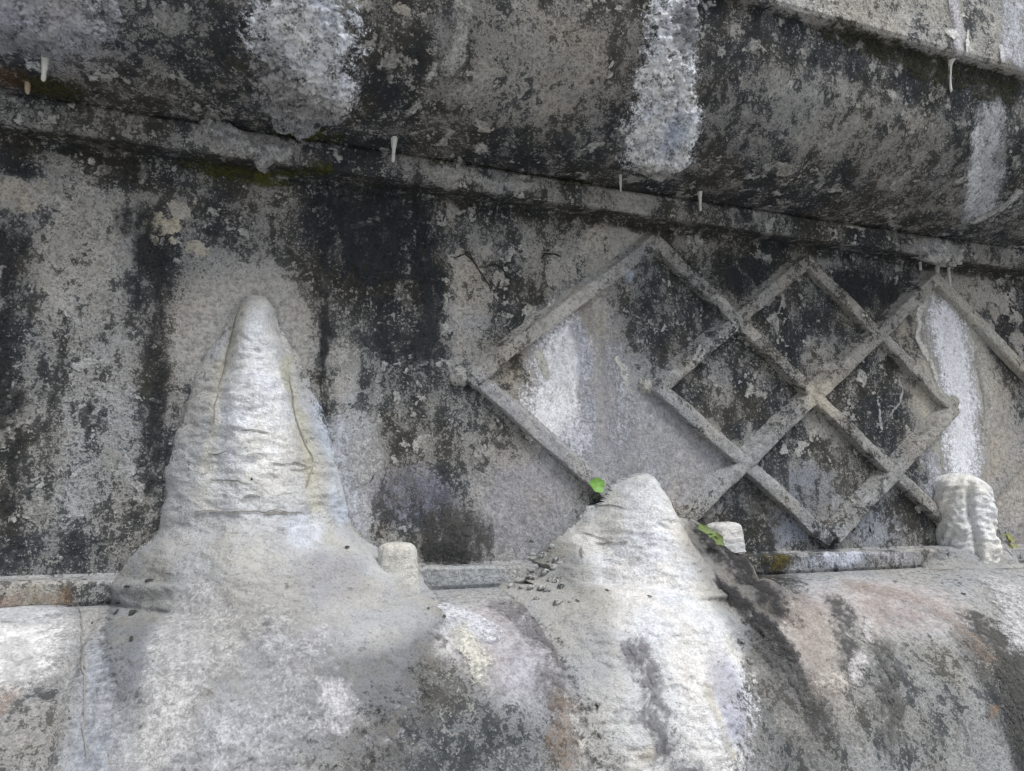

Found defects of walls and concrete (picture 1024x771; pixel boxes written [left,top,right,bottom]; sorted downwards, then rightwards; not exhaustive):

water stain [0,223,26,519]
crack [213,309,240,424]
crack [195,376,314,514]
water stain [95,182,910,771]
water stain [809,290,1024,771]